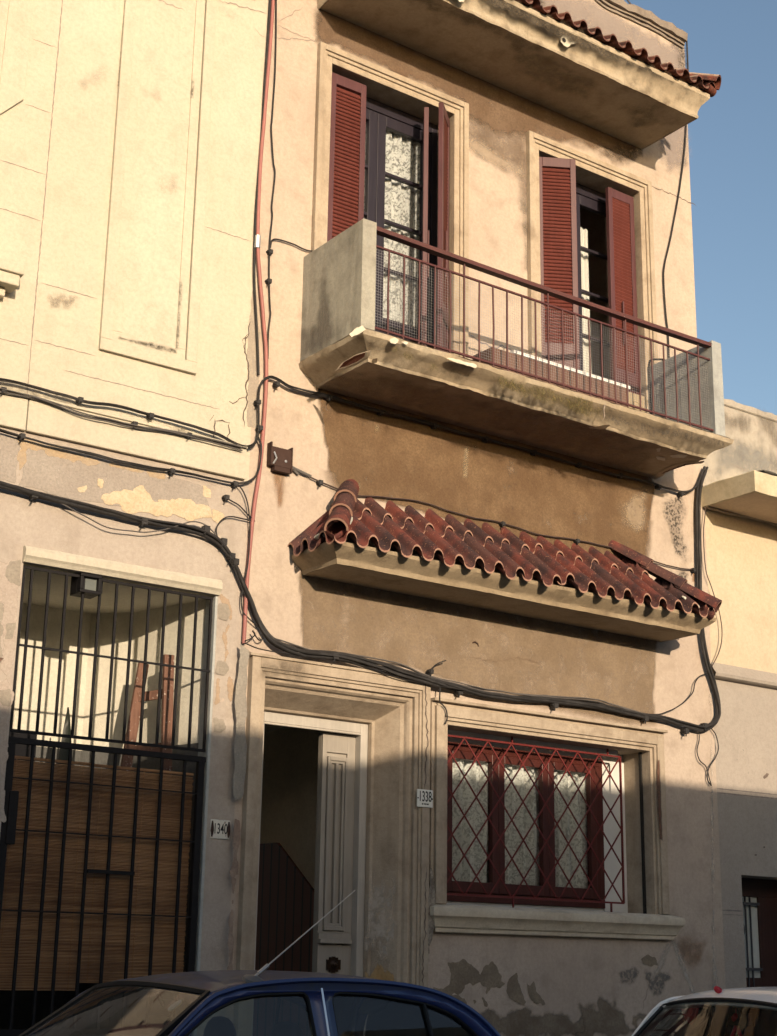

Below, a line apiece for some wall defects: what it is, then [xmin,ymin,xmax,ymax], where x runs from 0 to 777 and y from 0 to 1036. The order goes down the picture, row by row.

water stain [487,0,673,82]
crack [211,321,251,437]
peeling [17,439,224,523]
mould [665,498,686,556]
peeling [0,562,18,822]